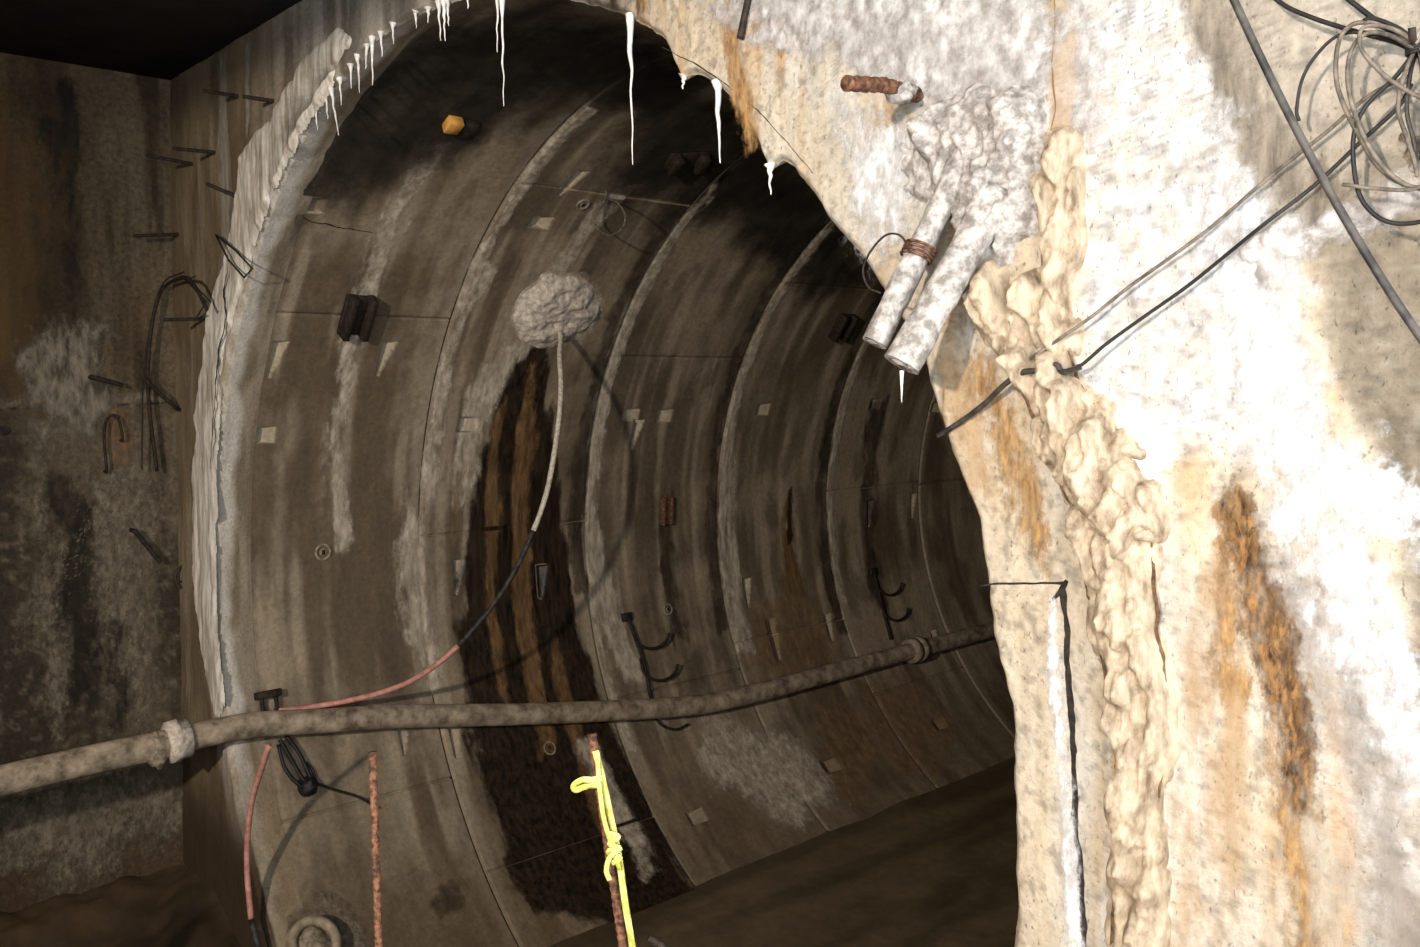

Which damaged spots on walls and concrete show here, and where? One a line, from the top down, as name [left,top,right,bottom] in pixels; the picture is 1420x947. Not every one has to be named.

peeling [698,0,1104,131]
water stain [303,0,917,704]
water stain [462,721,694,923]
efflorescence [698,711,832,827]
crack [980,579,1088,947]
rust [1208,486,1322,947]